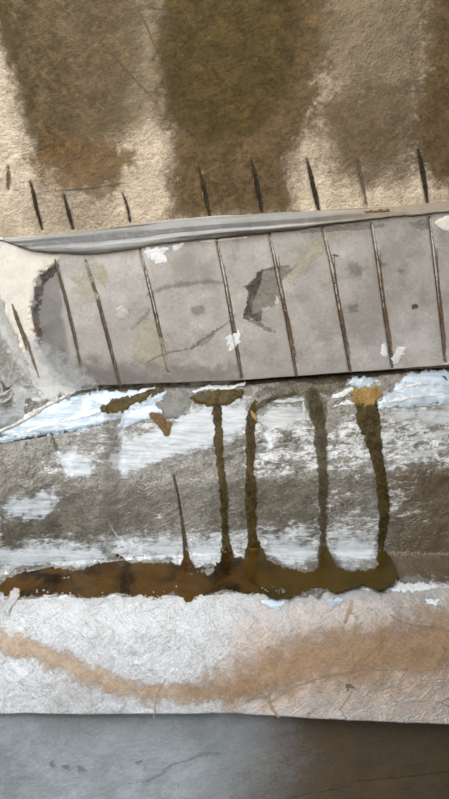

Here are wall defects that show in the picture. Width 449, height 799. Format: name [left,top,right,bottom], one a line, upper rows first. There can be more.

crack [4,166,12,190]
damp [0,0,136,198]
crack [30,182,131,230]
peeling [152,317,241,360]
crack [199,171,211,216]
crack [251,161,263,213]
spalling [243,266,295,332]
crack [268,233,298,377]
damp [158,0,449,218]
crack [306,158,352,373]
crack [418,149,447,363]
damp [10,367,449,567]